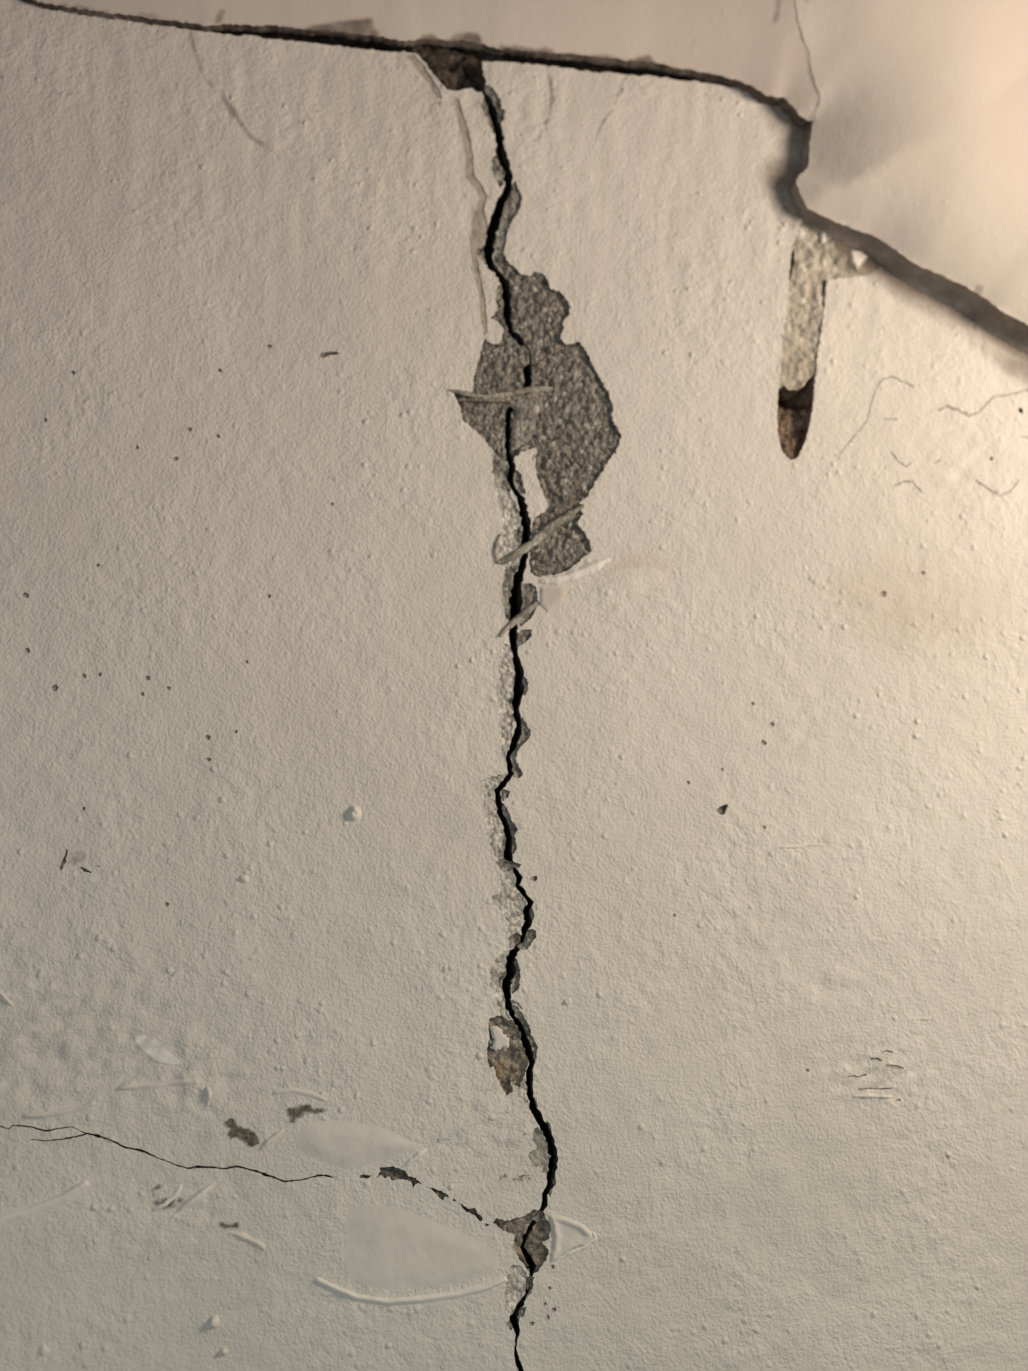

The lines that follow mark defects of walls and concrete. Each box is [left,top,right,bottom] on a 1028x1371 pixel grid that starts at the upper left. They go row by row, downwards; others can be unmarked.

peeling [850,251,867,270]
flaking render [451,256,622,577]
spalling [777,375,815,460]
flaking render [499,600,540,637]
crack [177,27,718,1371]
crack [0,1125,489,1226]
flaking render [528,1127,550,1174]